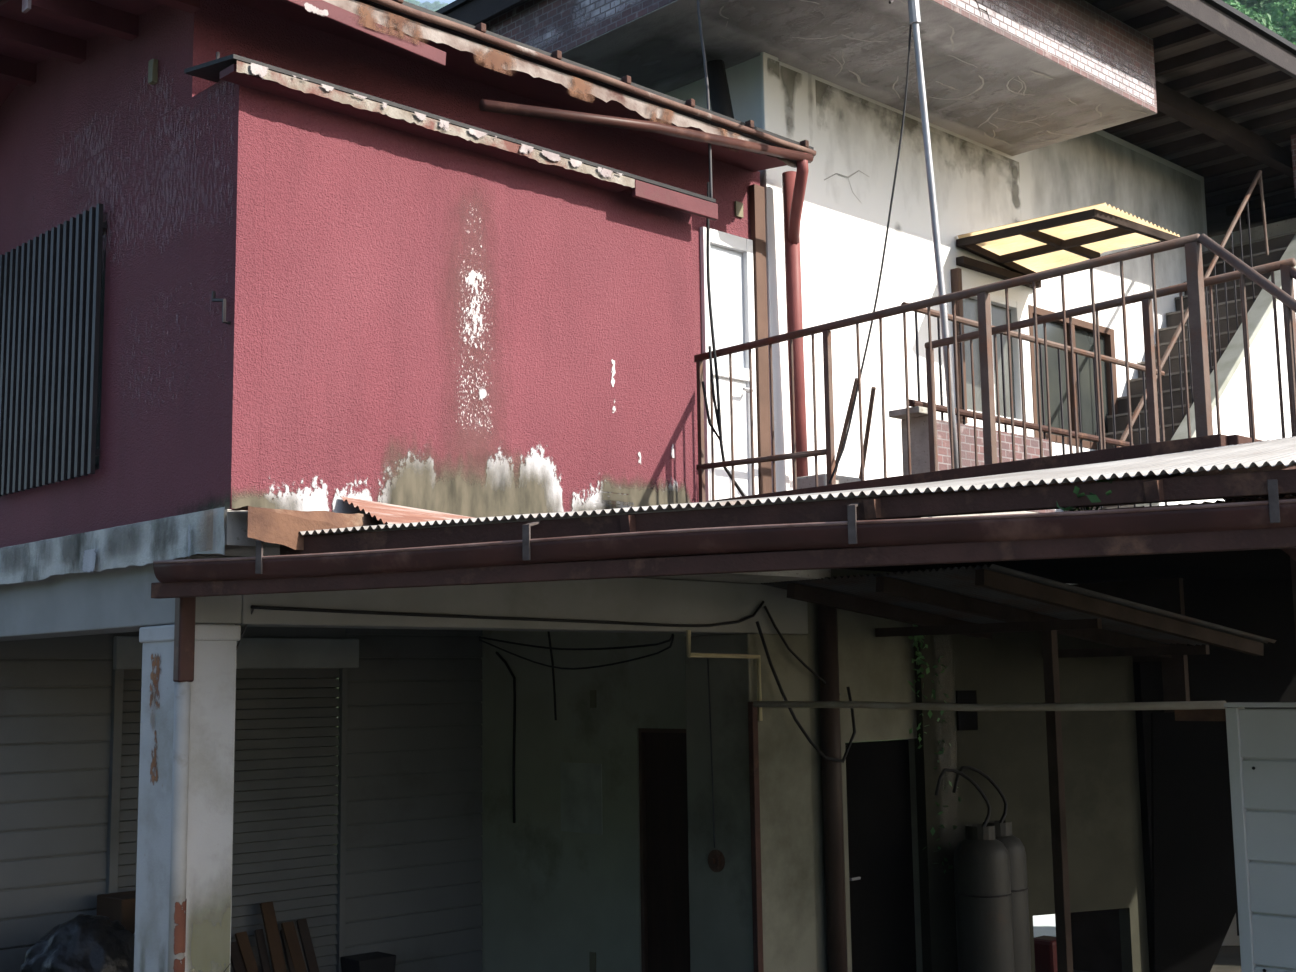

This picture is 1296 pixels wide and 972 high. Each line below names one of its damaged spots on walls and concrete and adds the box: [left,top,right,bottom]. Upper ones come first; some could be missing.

rust [358,4,423,44]
rust [476,48,513,74]
rust [569,77,592,101]
water stain [607,39,714,86]
water stain [718,0,1079,222]
water stain [944,0,1154,114]
crack [824,170,869,204]
peeling [453,205,634,512]
peeling [266,452,434,515]
rust [149,654,161,709]
rust [150,730,158,785]
peeling [173,899,187,972]